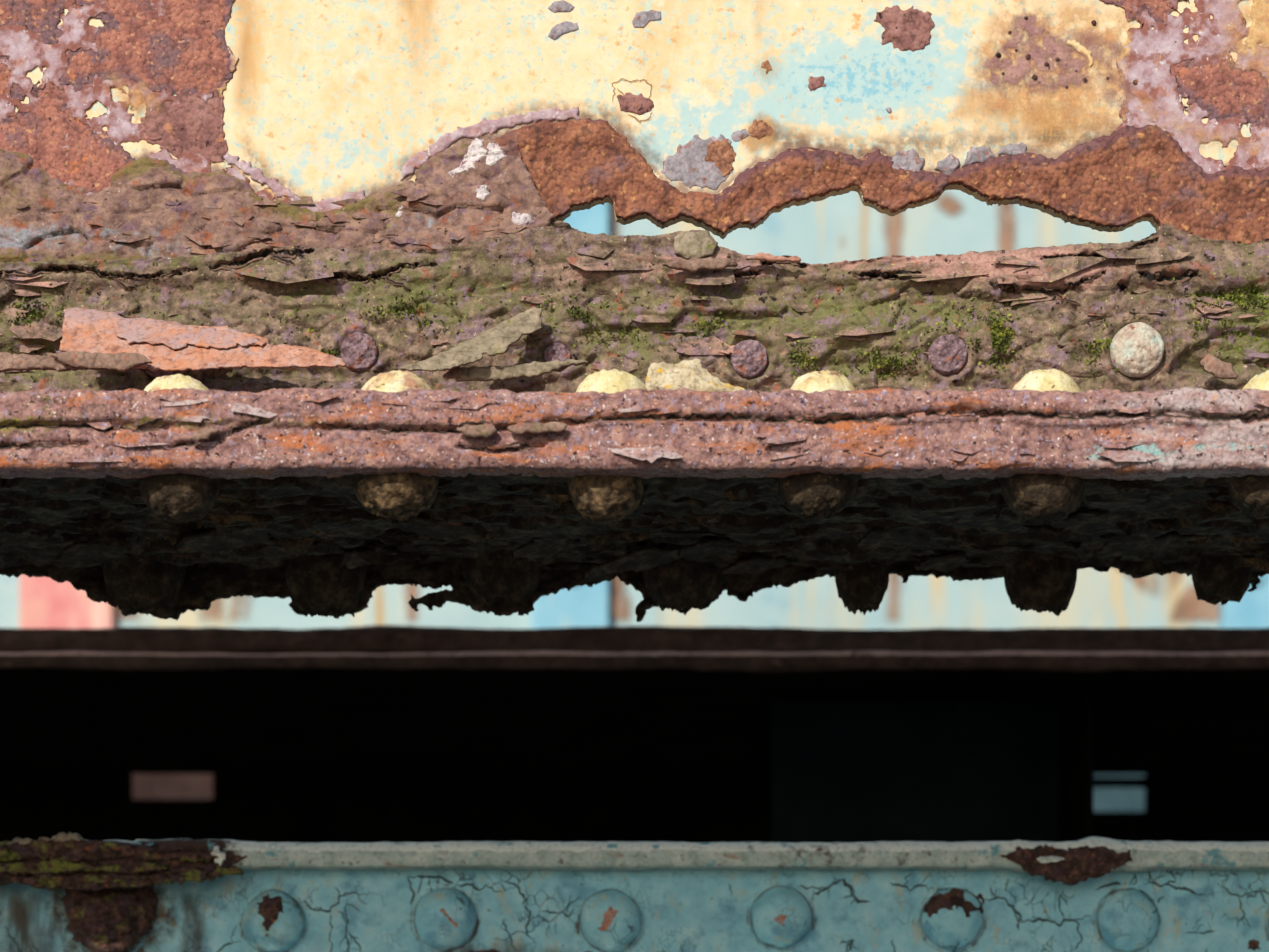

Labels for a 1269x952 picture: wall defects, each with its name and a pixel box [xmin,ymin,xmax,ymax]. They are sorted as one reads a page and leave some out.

corrosion [0,0,1269,273]
peeling [661,129,749,190]
peeling [891,142,1027,175]
corrosion [457,422,567,439]
corrosion [1172,572,1220,621]
crack [303,886,369,952]
crack [407,875,583,951]
crack [800,873,950,904]
corrosion [924,888,985,923]
corrosion [1000,844,1133,885]
crack [985,870,1269,952]
crack [841,939,859,952]